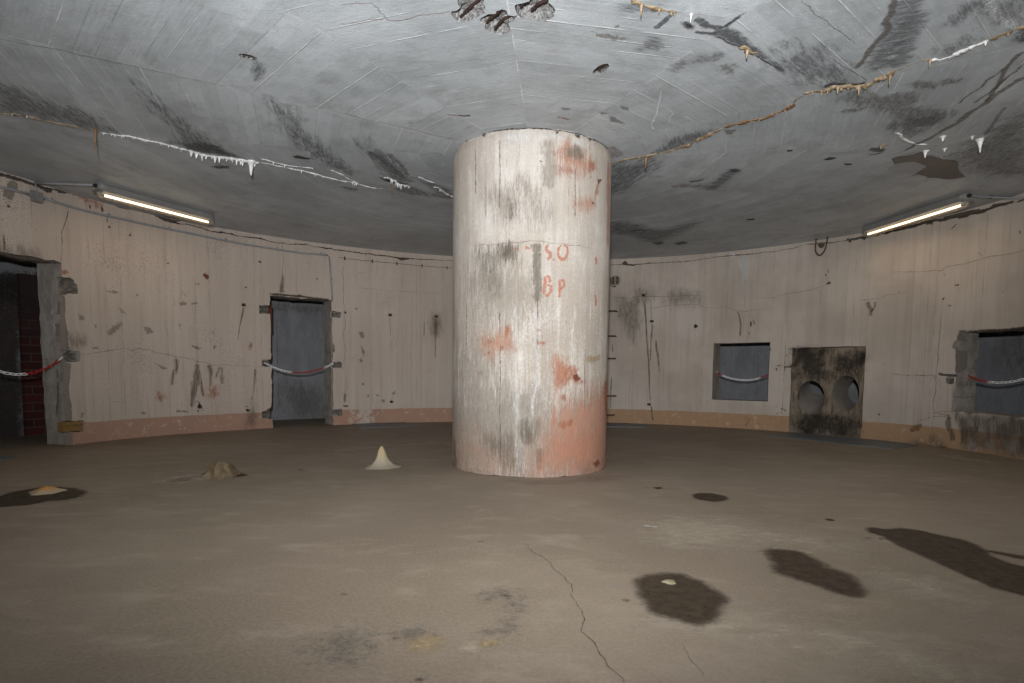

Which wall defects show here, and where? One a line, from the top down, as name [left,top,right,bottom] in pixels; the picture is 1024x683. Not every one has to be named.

water stain [0,84,453,198]
spalling [453,0,553,35]
rust [559,141,610,243]
crack [714,13,784,71]
water stain [611,0,1024,192]
peeling [888,152,965,180]
rust [534,356,607,476]
crack [526,544,624,682]